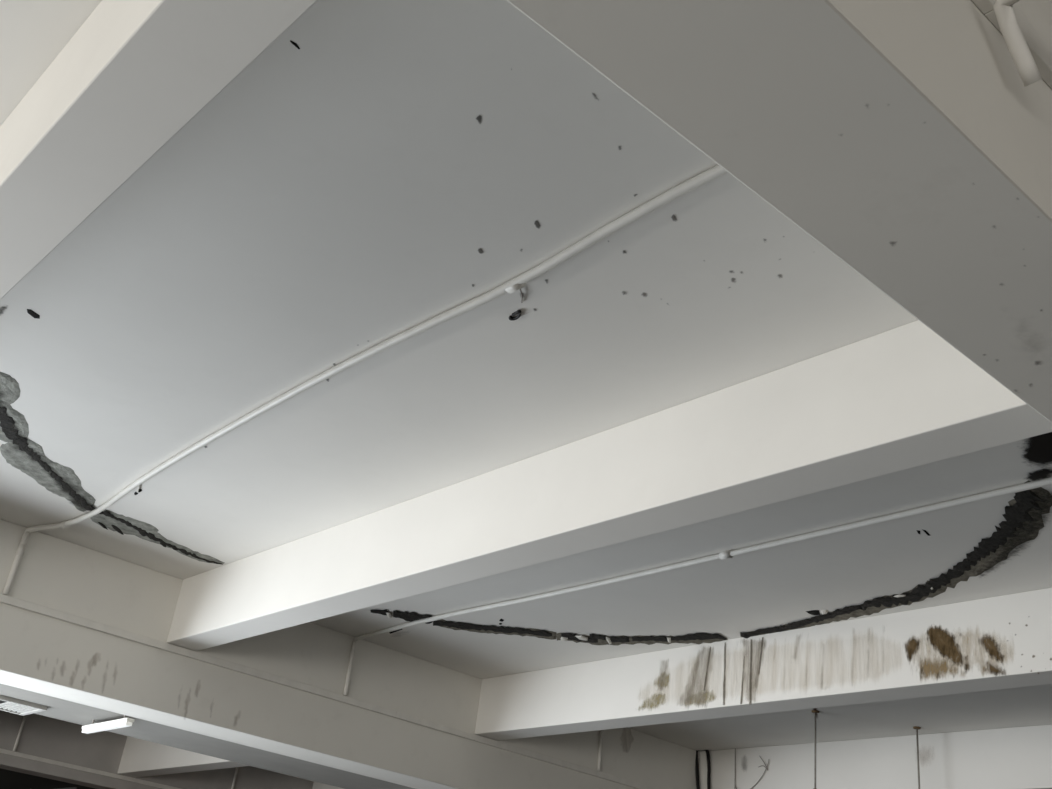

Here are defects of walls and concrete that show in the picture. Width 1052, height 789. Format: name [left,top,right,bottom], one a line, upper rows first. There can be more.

crack [0,372,225,565]
crack [370,432,1052,645]
rust [905,626,969,677]
rust [981,636,1005,676]